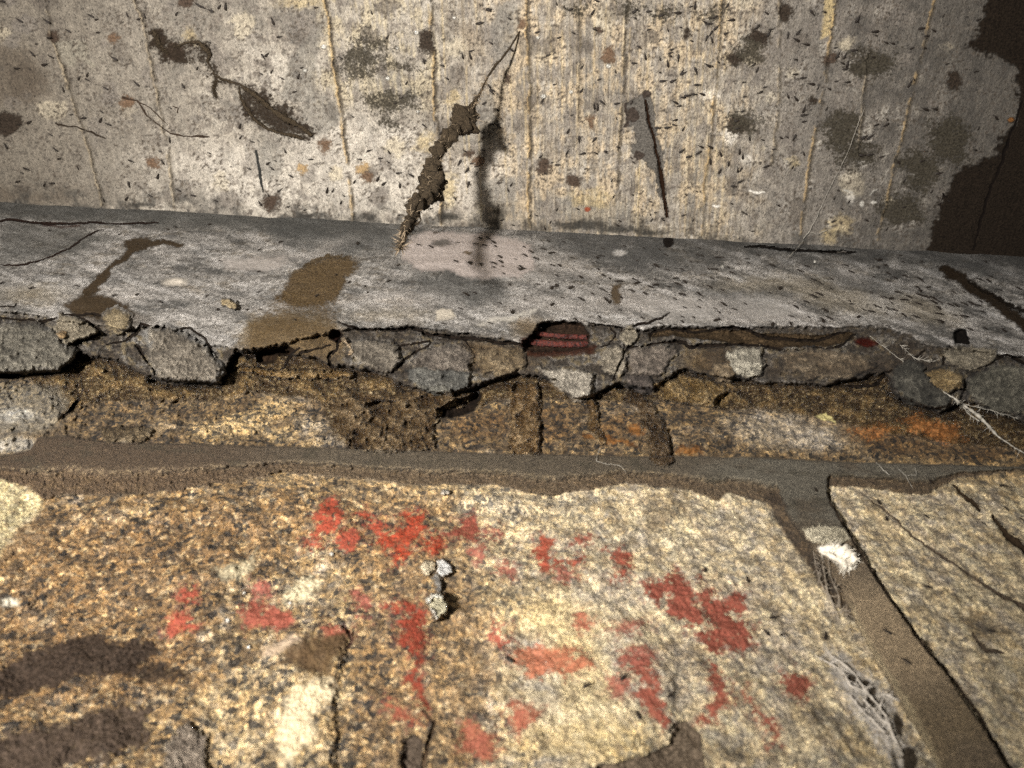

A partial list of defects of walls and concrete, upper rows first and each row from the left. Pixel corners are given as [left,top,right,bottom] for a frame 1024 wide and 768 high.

crack [122,96,209,138]
crack [644,100,669,218]
leakage [873,0,1024,332]
crack [0,218,159,266]
leakage [63,238,183,319]
leakage [225,256,282,270]
leakage [276,254,357,307]
spalling [523,321,590,352]